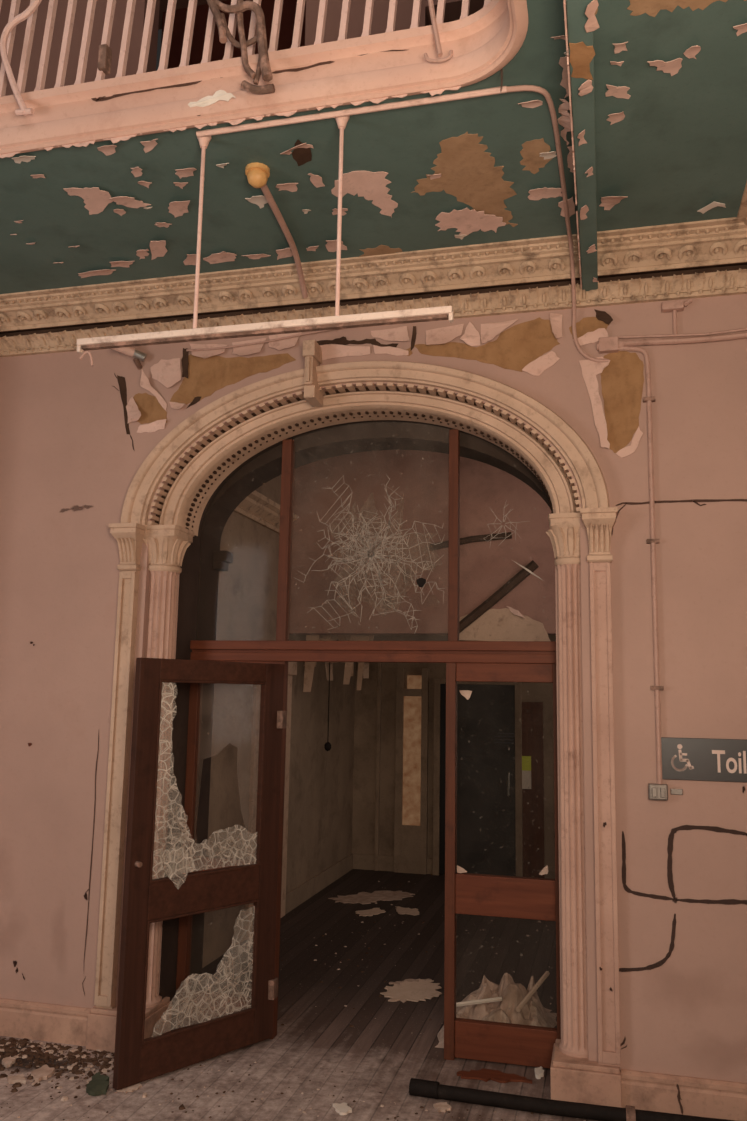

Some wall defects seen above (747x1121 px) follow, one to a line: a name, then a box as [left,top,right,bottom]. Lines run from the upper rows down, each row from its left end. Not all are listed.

peeling [627,0,728,17]
peeling [647,45,701,76]
peeling [411,0,631,288]
peeling [63,187,152,216]
peeling [78,167,197,278]
peeling [245,195,268,209]
peeling [276,140,398,218]
peeling [697,201,726,214]
peeling [183,248,293,265]
peeling [316,309,613,376]
peeling [117,332,302,434]
peeling [579,351,644,458]